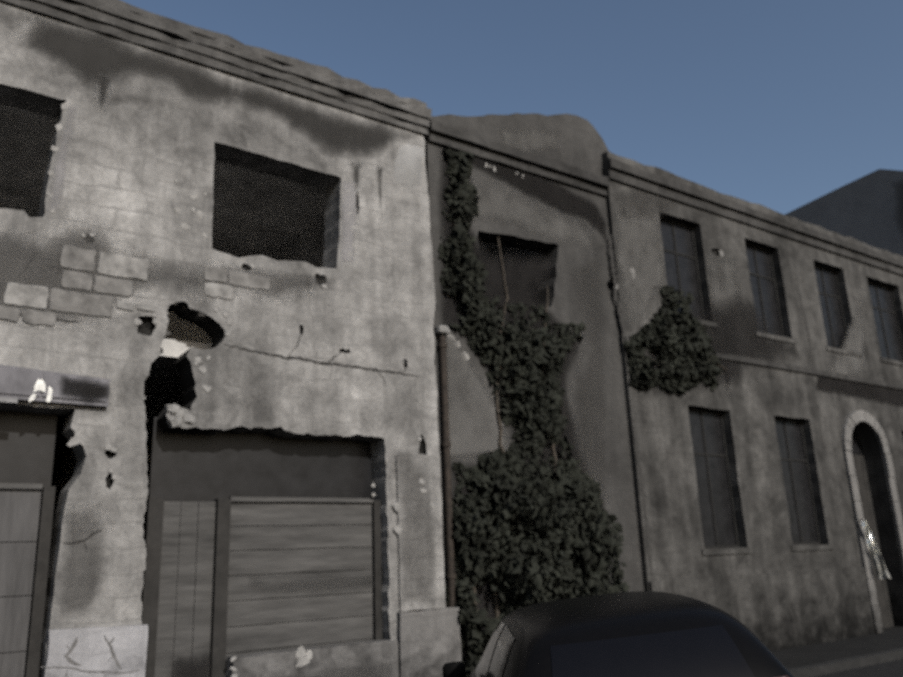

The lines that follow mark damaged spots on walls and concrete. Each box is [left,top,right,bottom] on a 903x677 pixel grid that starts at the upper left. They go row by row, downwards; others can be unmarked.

crack [224,334,419,384]